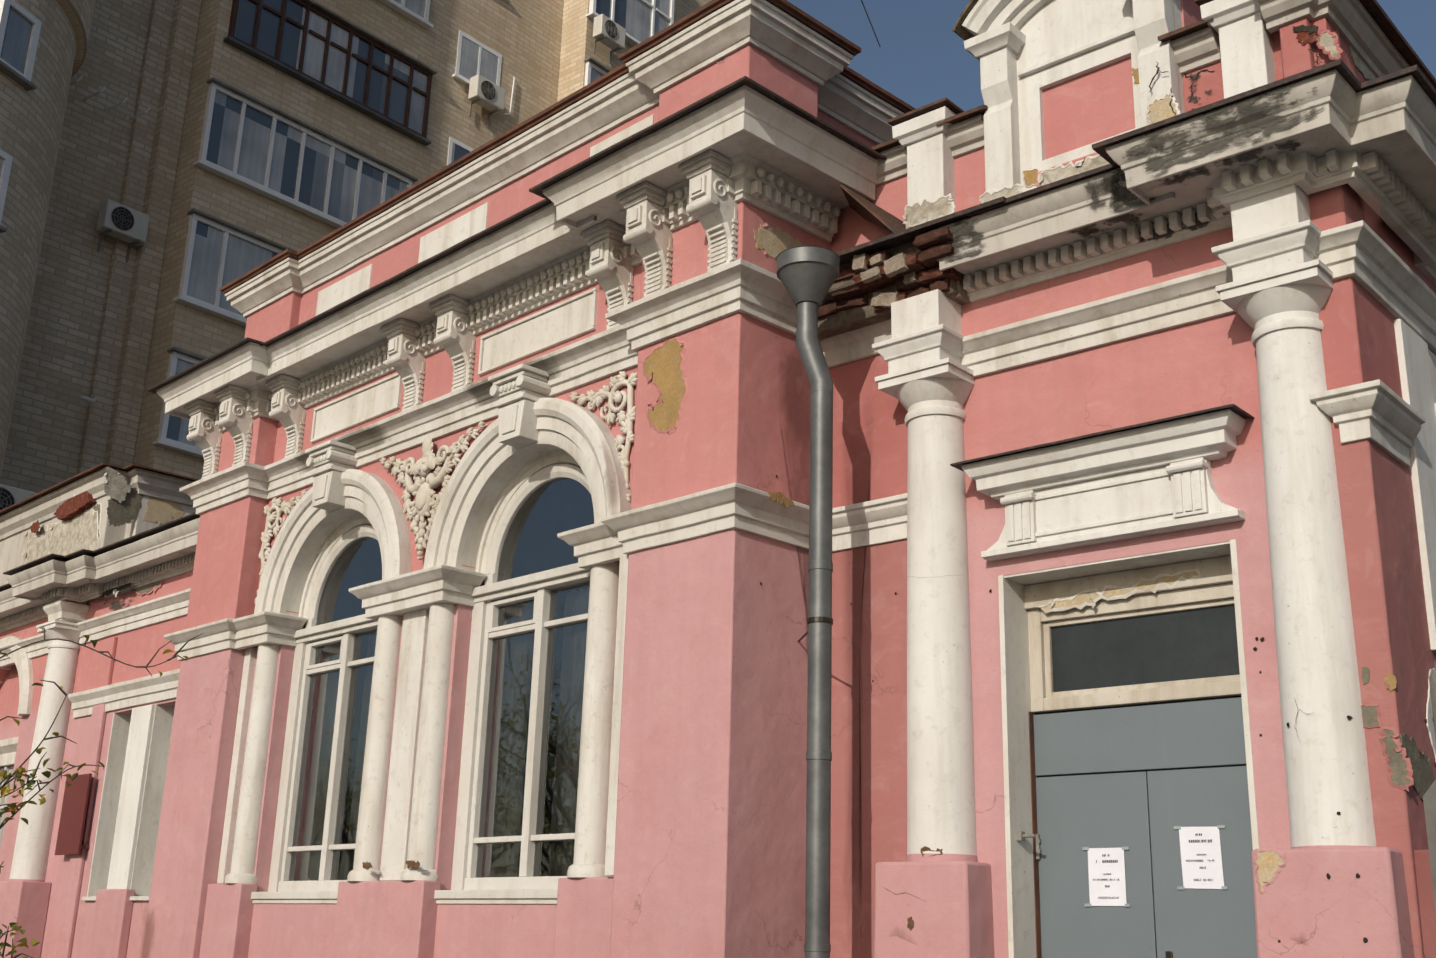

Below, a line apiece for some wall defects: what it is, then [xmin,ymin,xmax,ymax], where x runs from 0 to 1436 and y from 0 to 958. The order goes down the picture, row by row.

peeling [1292,24,1343,60]
peeling [1146,93,1180,125]
leakage [1070,73,1323,243]
peeling [753,222,802,259]
peeling [818,193,964,319]
peeling [642,336,688,435]
peeling [1035,568,1202,613]
peeling [1361,667,1436,801]
peeling [1252,846,1287,895]